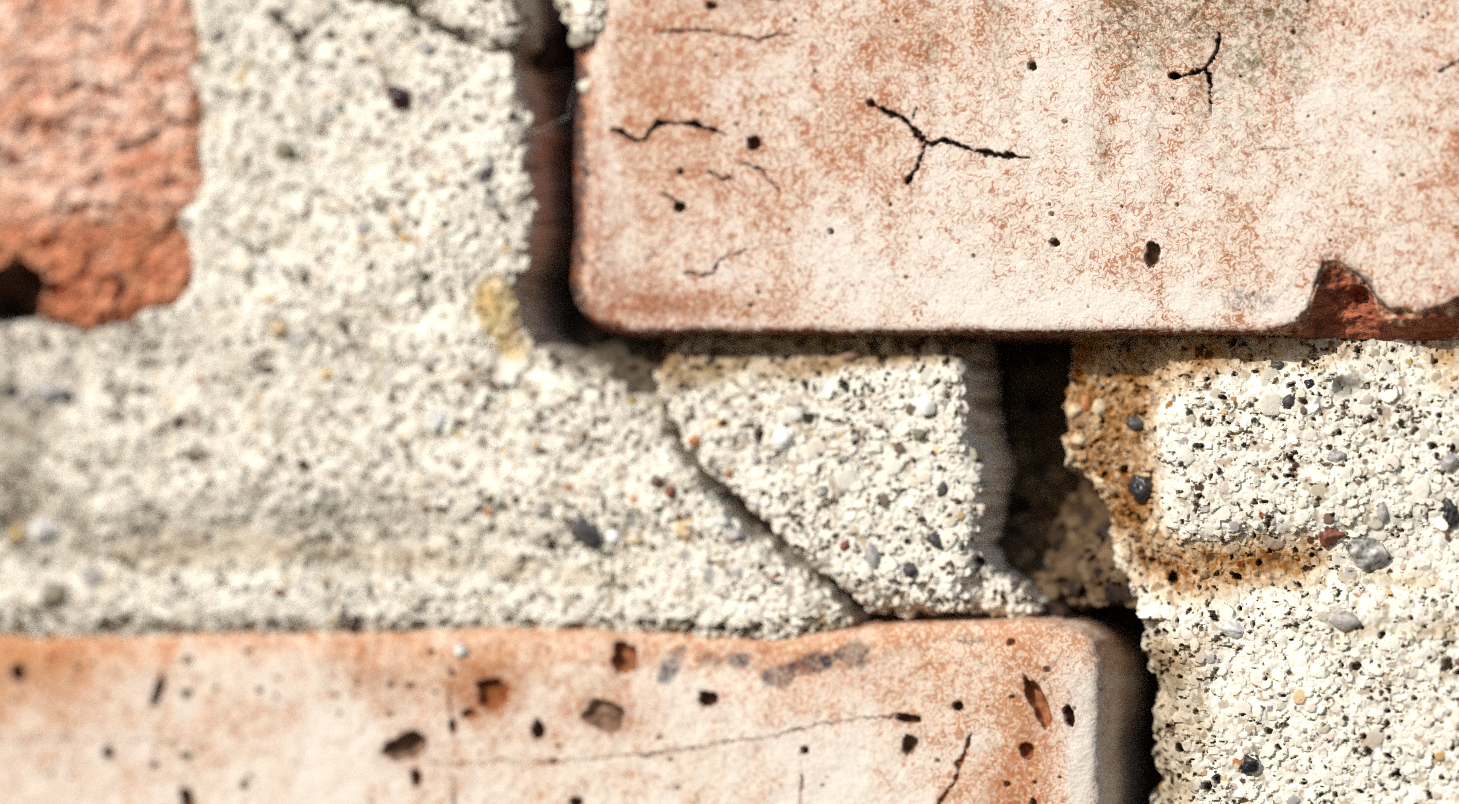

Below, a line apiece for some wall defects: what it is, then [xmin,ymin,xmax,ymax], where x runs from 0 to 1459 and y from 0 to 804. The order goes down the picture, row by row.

crack [115,21,196,149]
crack [1170,33,1222,113]
crack [610,119,726,142]
crack [875,106,1019,185]
spalling [1277,260,1459,344]
crack [714,477,991,624]